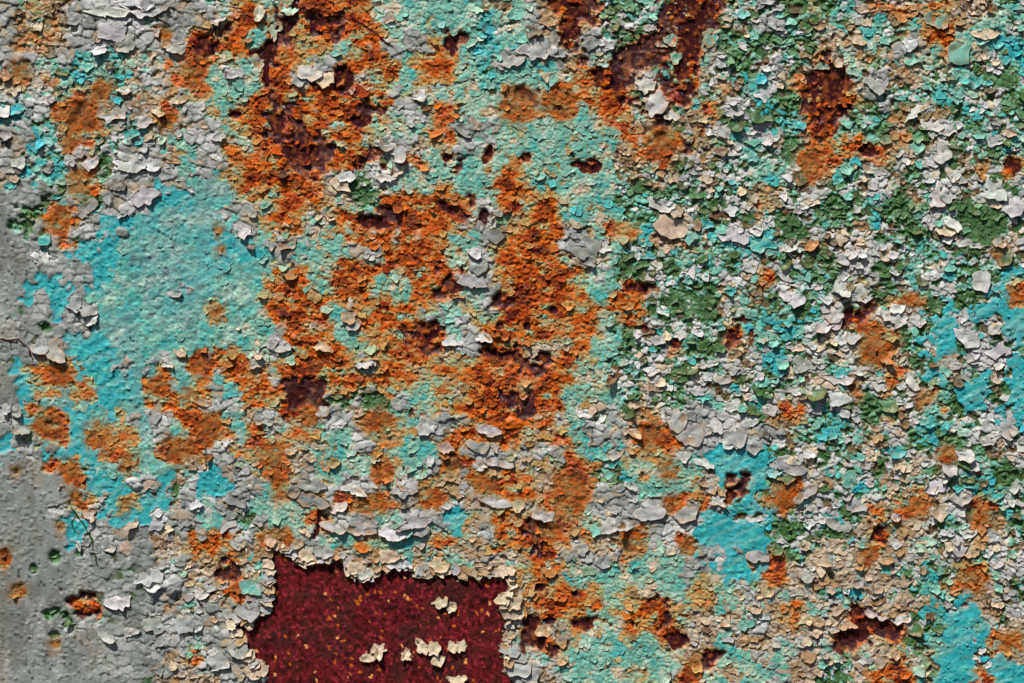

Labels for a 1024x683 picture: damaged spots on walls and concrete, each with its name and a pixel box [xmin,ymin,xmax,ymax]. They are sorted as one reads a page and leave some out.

rust [43,67,118,154]
peeling [285,63,342,89]
peeling [486,0,577,83]
peeling [0,0,240,439]
rust [39,361,93,400]
rust [140,0,613,648]
peeling [531,0,1024,683]
rust [860,320,899,381]
rust [85,407,140,473]
peeling [195,383,369,500]
rust [621,417,688,477]
peeling [50,405,576,683]